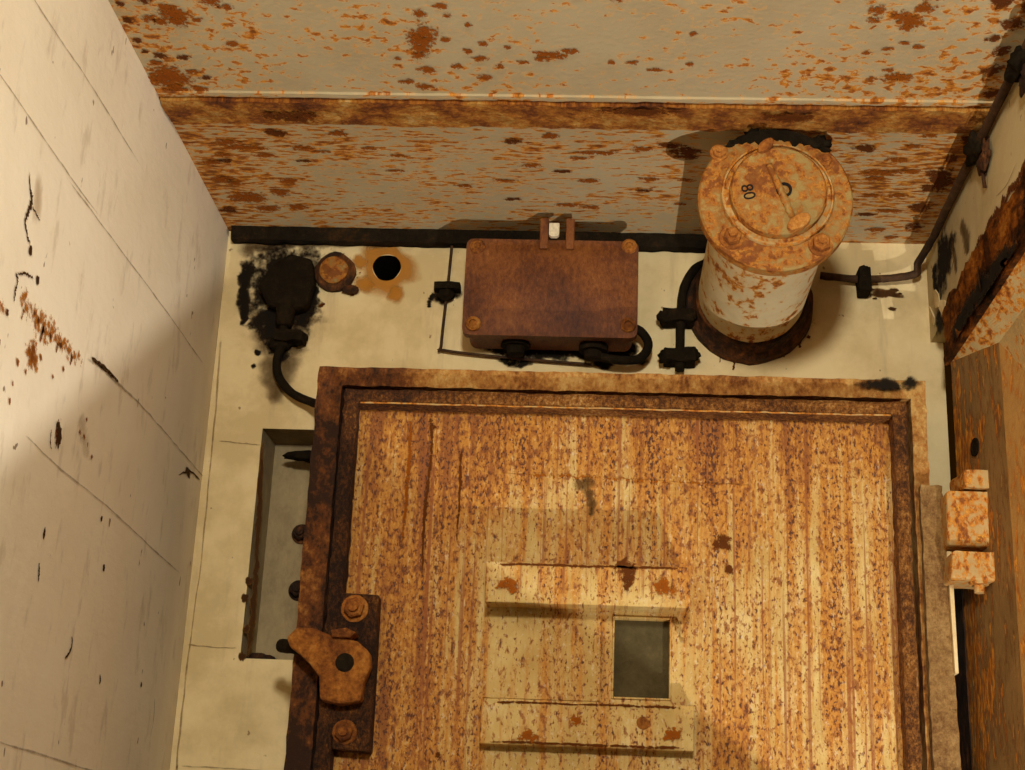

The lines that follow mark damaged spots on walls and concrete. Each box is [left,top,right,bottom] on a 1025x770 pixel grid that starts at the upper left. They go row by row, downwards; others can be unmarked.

rust [115,0,203,28]
rust [132,38,211,91]
rust [395,3,452,91]
rust [516,49,579,65]
rust [862,0,938,55]
rust [979,0,1025,99]
rust [202,111,321,213]
rust [632,143,703,160]
rust [852,134,968,240]
rust [342,246,414,301]
rust [0,289,82,378]
damp [256,332,302,401]